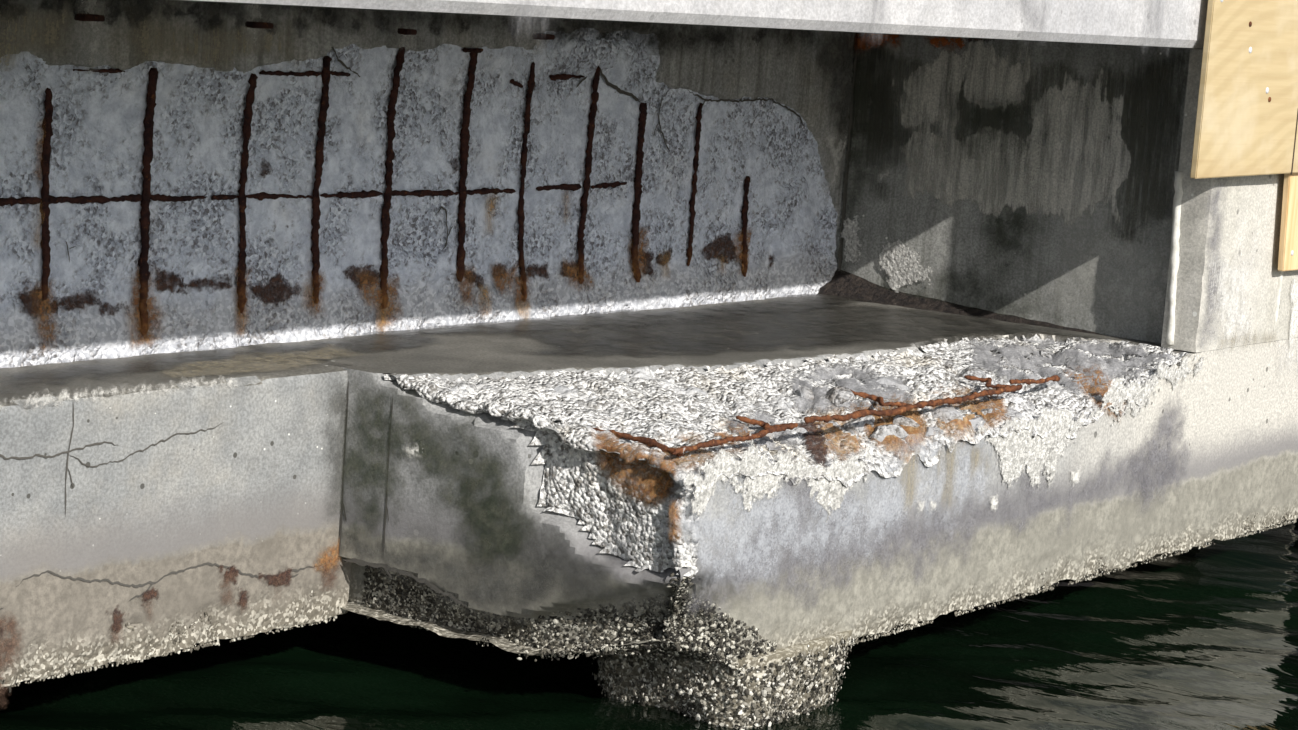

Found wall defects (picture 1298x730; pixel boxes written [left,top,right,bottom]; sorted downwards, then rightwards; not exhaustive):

spalling [0,28,864,368]
water stain [818,32,1183,318]
corrosion [17,268,324,347]
corrosion [343,265,401,328]
corrosion [461,260,593,309]
corrosion [700,231,752,272]
spalling [878,239,933,293]
spalling [27,388,117,406]
crack [0,381,467,610]
spalling [384,334,1189,579]
corrosion [798,392,1005,500]
water stain [346,530,614,613]